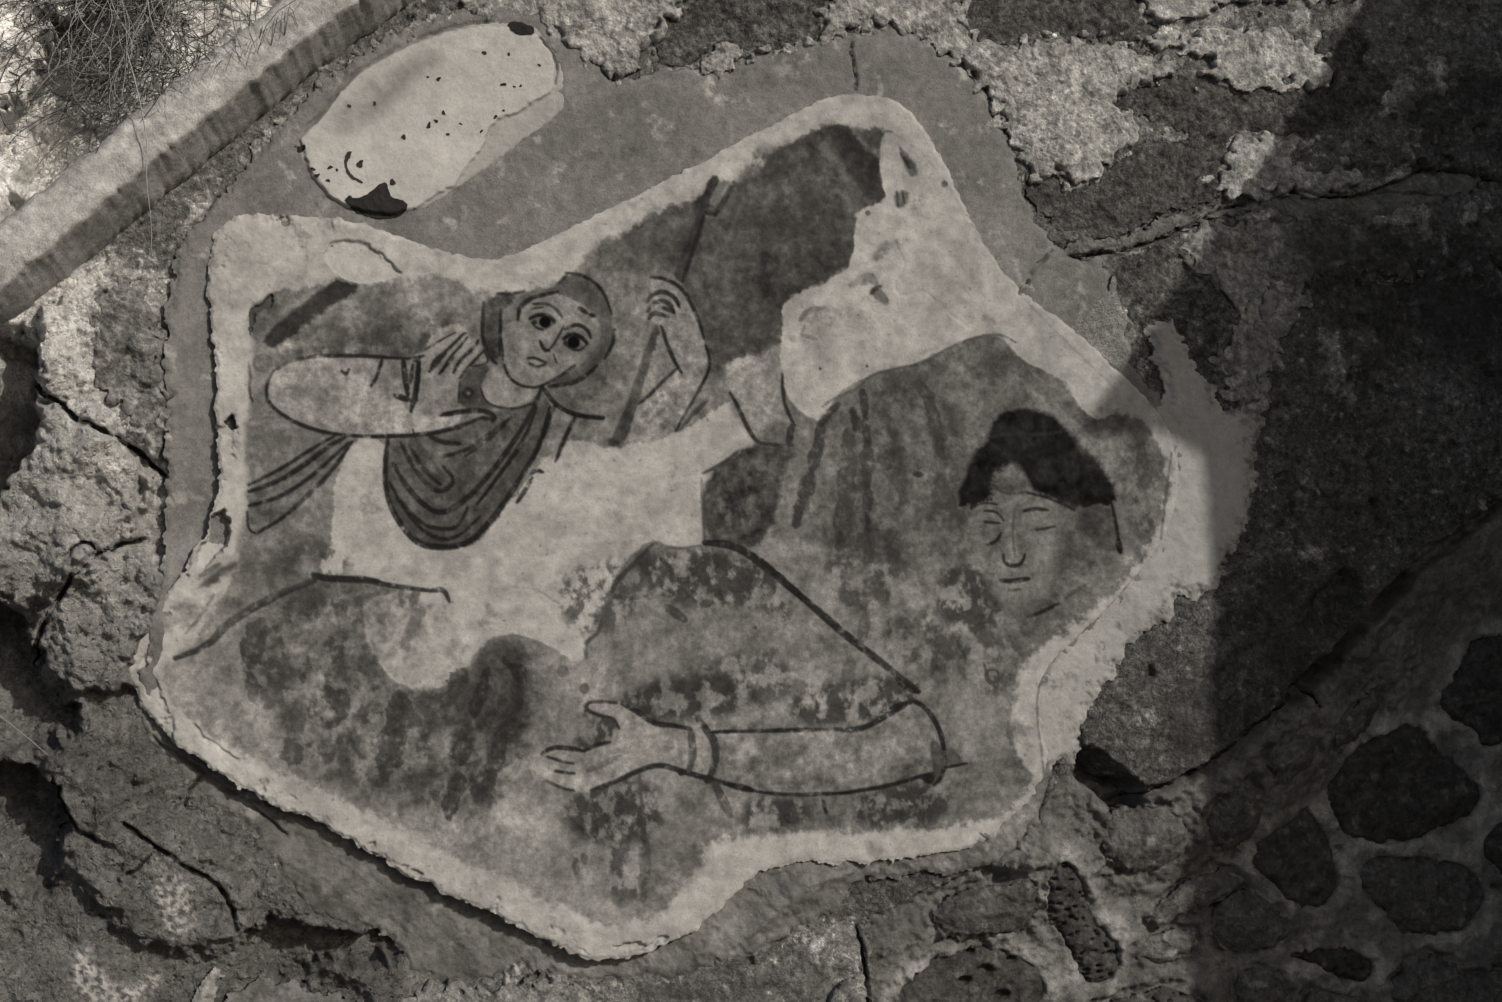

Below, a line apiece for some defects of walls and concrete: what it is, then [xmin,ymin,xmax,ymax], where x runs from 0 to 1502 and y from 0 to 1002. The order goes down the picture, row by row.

spalling [656,0,830,67]
spalling [960,0,1159,46]
crack [1277,170,1493,199]
crack [1085,229,1179,257]
crack [34,383,168,477]
crack [51,779,239,930]
crack [856,927,869,1002]